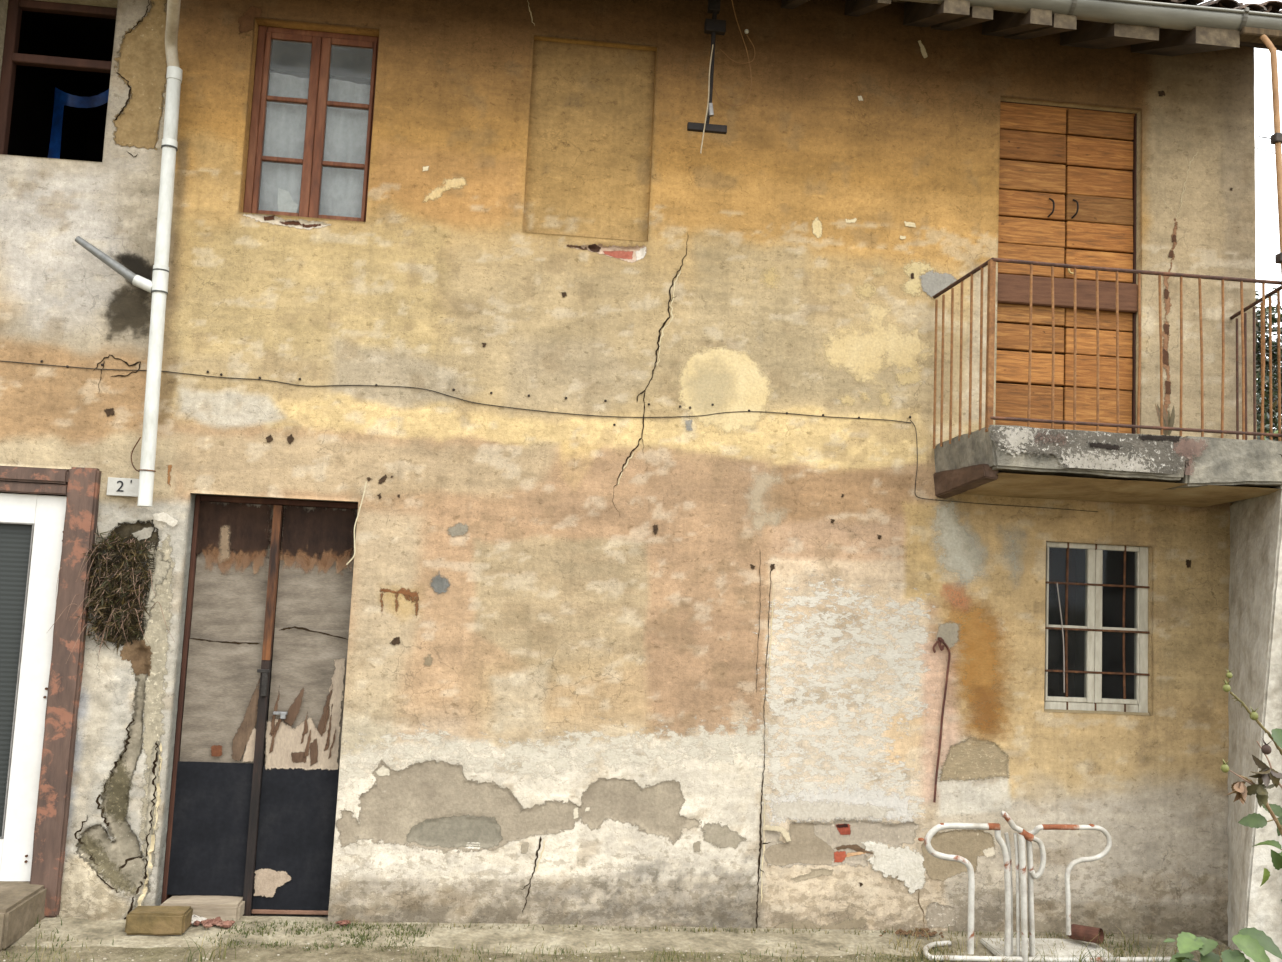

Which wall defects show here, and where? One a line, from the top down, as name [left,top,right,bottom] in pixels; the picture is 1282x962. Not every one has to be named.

crack [114,72,131,121]
peeling [423,177,466,202]
flaking render [567,244,647,263]
damp [105,254,153,339]
crack [612,239,688,515]
corrosion [380,588,419,616]
flaking render [336,578,996,887]
crack [756,559,773,928]
flaking render [940,737,1010,782]
crack [74,719,162,919]
crack [522,836,545,912]